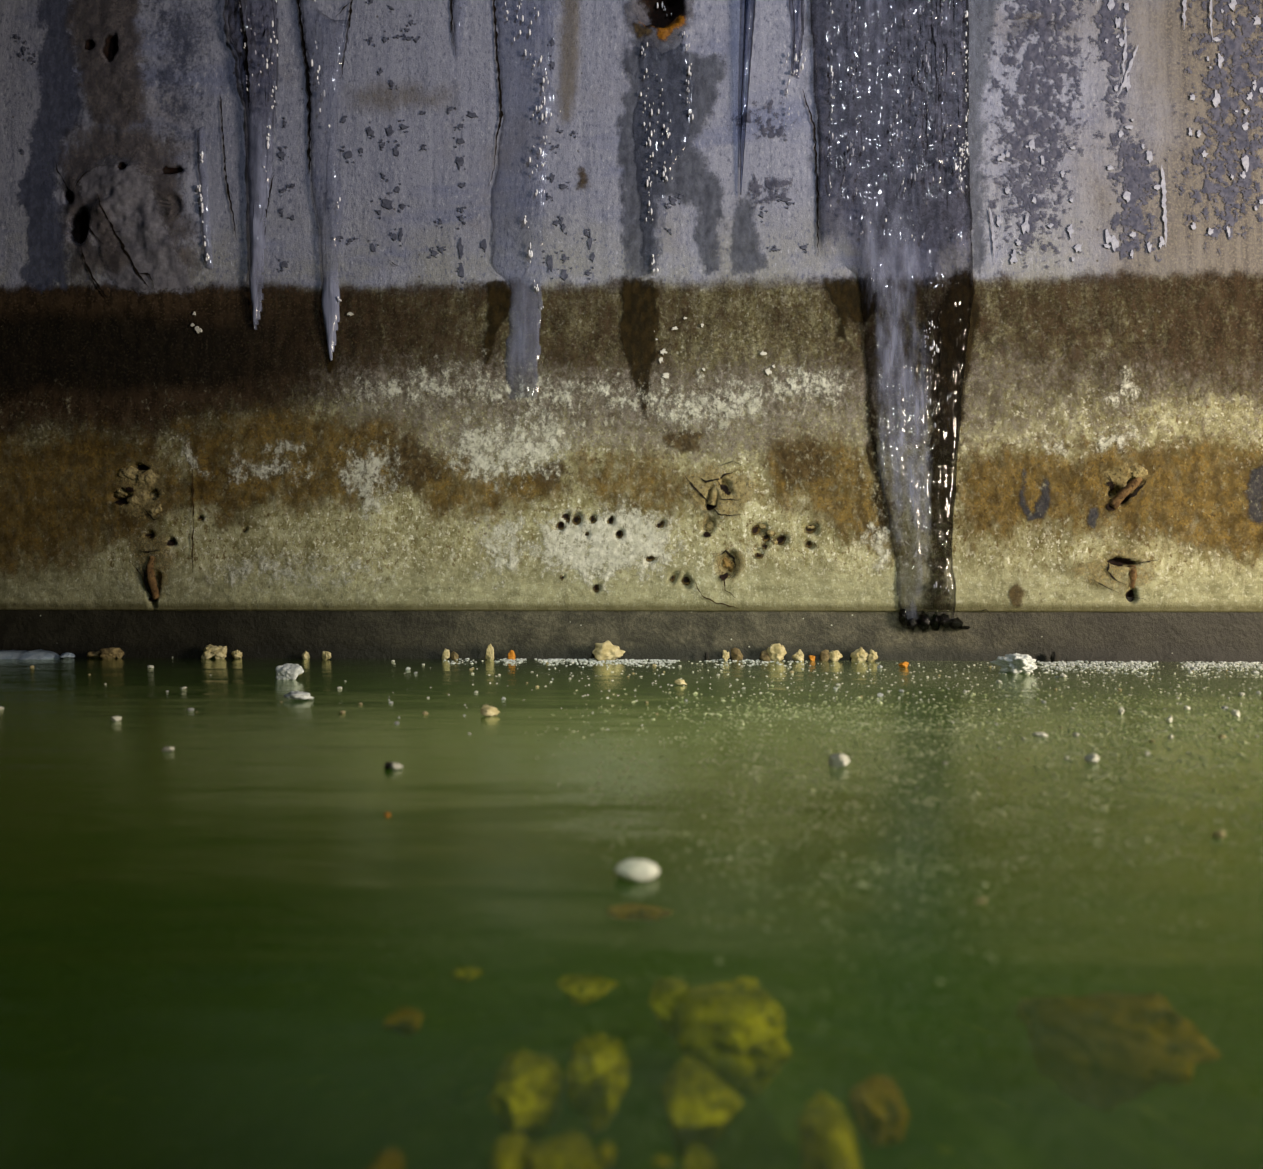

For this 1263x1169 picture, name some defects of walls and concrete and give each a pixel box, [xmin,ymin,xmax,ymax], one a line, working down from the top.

peeling [977,0,1263,270]
crack [54,159,154,303]
damp [0,0,1263,631]
spalling [115,462,176,601]
spalling [557,514,623,539]
corrosion [957,437,1263,563]
spalling [1073,549,1159,601]